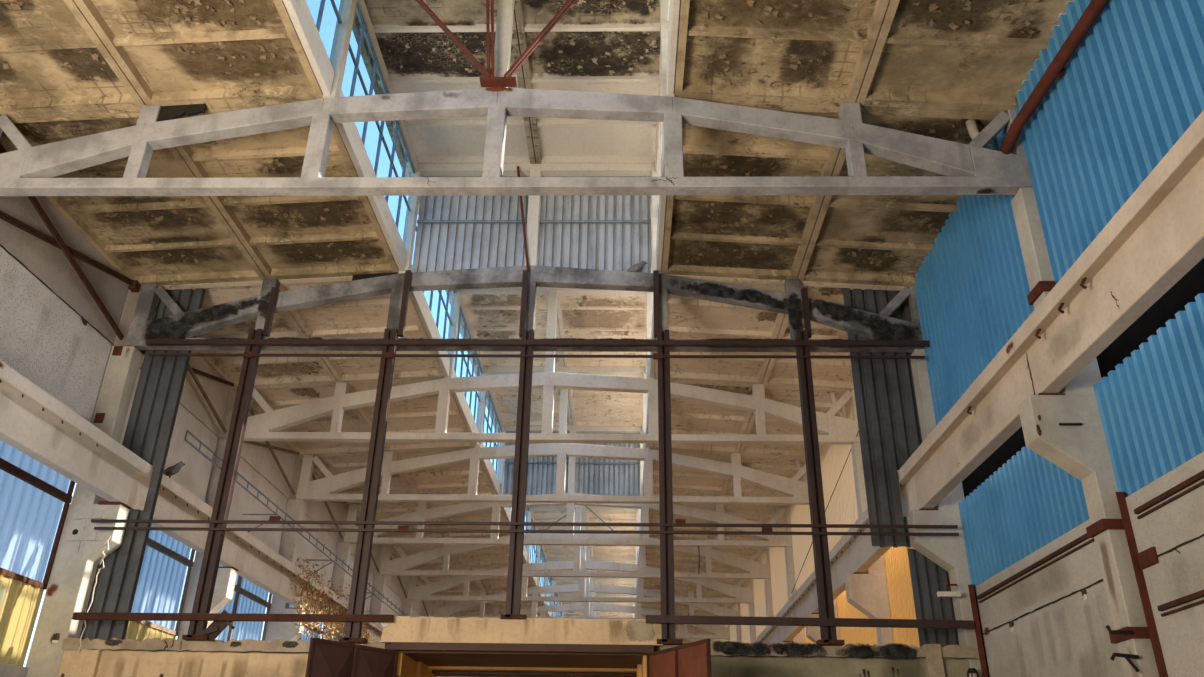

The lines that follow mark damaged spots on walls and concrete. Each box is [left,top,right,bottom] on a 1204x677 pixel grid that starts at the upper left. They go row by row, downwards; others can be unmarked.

water stain [713,641,917,677]